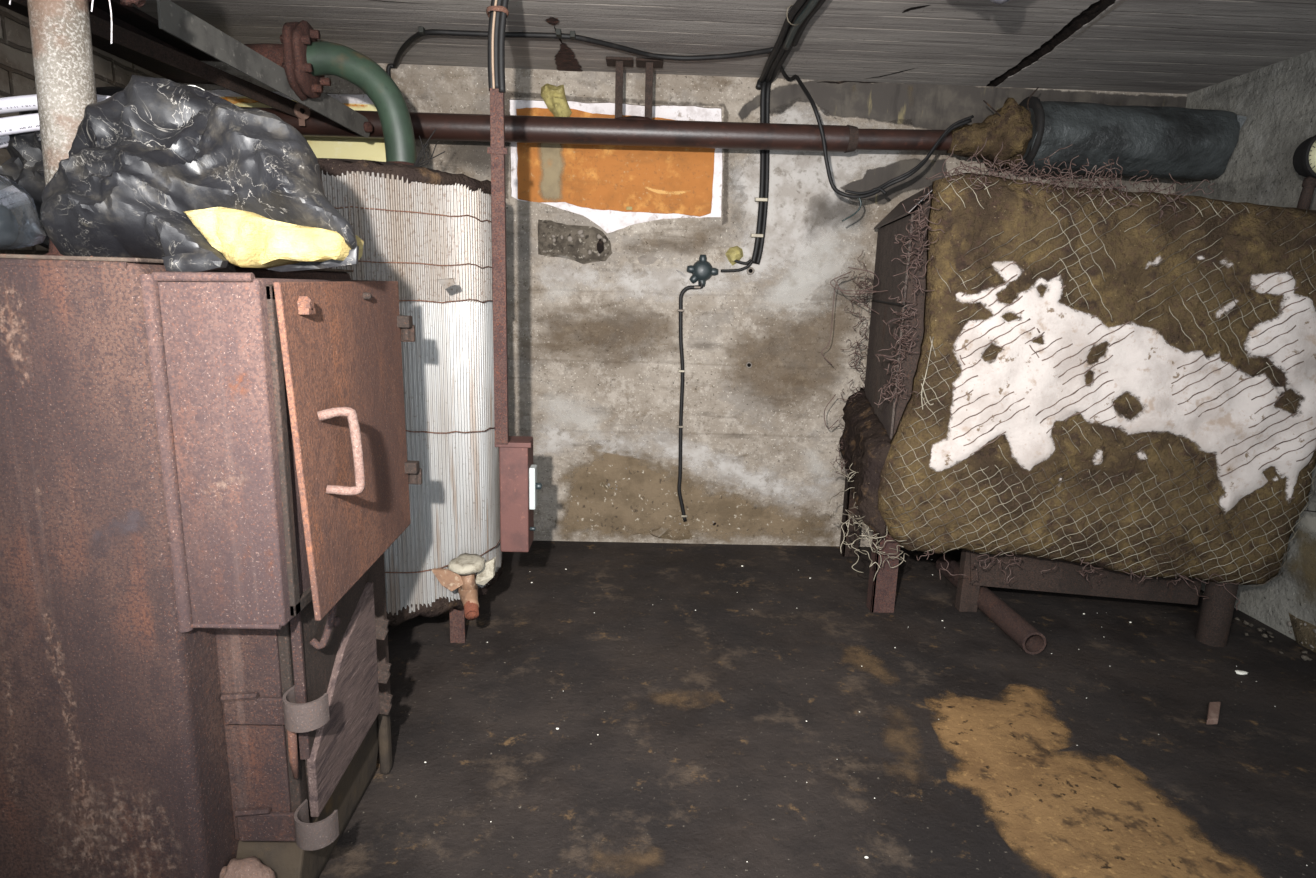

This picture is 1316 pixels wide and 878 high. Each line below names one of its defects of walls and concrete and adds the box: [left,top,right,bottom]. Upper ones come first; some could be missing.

crack [987,0,1127,87]
leakage [542,428,572,451]
leakage [658,441,787,493]